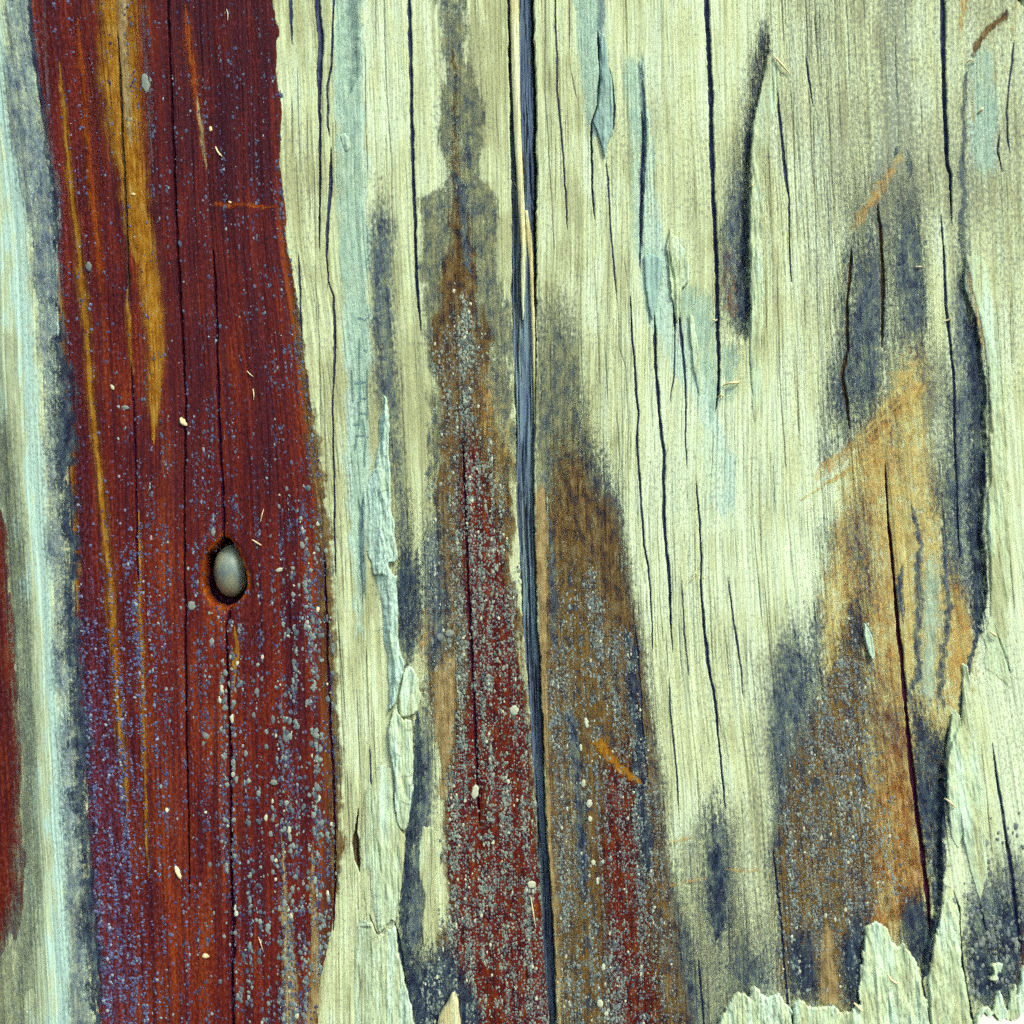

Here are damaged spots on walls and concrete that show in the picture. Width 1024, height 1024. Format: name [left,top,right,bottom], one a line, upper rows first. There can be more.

peeling [31,0,346,1024]
peeling [335,0,421,1024]
crack [407,0,421,330]
peeling [419,826,440,945]
crack [554,0,726,809]
leakage [367,0,1024,1024]
crack [877,205,885,348]
crack [940,0,960,555]